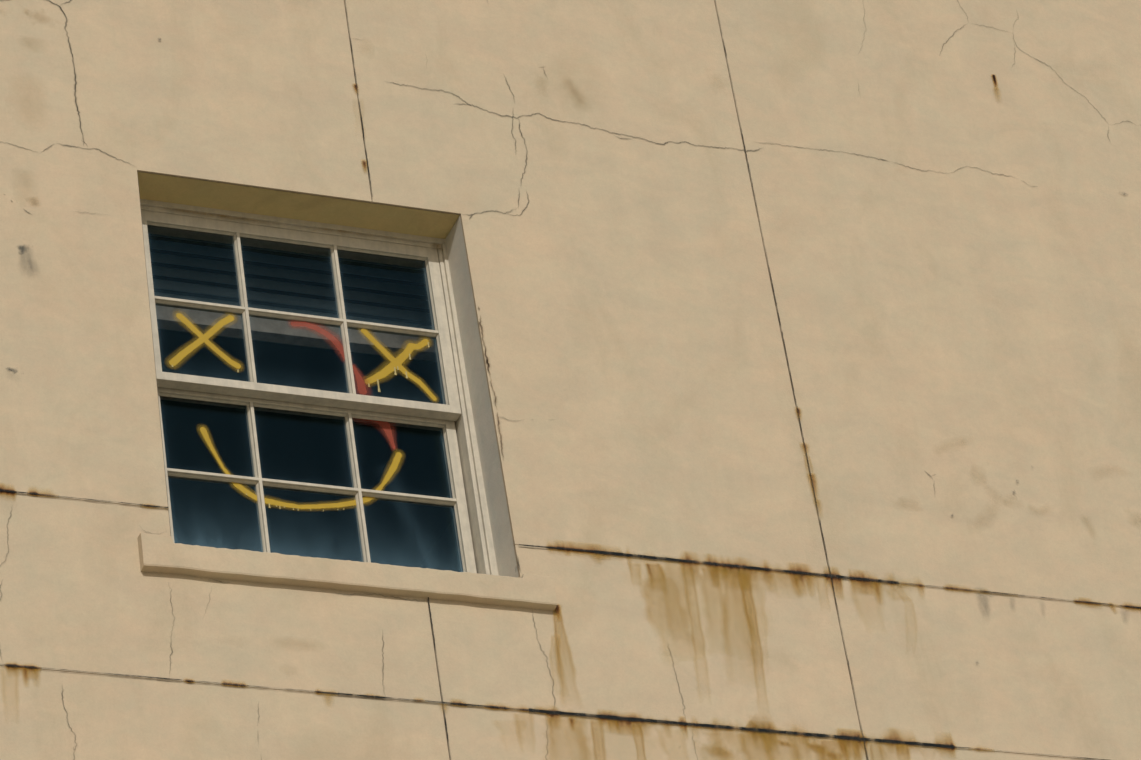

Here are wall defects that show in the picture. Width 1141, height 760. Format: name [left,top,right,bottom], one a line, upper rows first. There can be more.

crack [15,0,123,161]
crack [392,80,756,218]
rust [0,486,51,497]
rust [679,556,923,594]
rust [5,663,40,678]
rust [483,705,573,726]
rust [597,713,868,758]
rust [884,734,917,746]